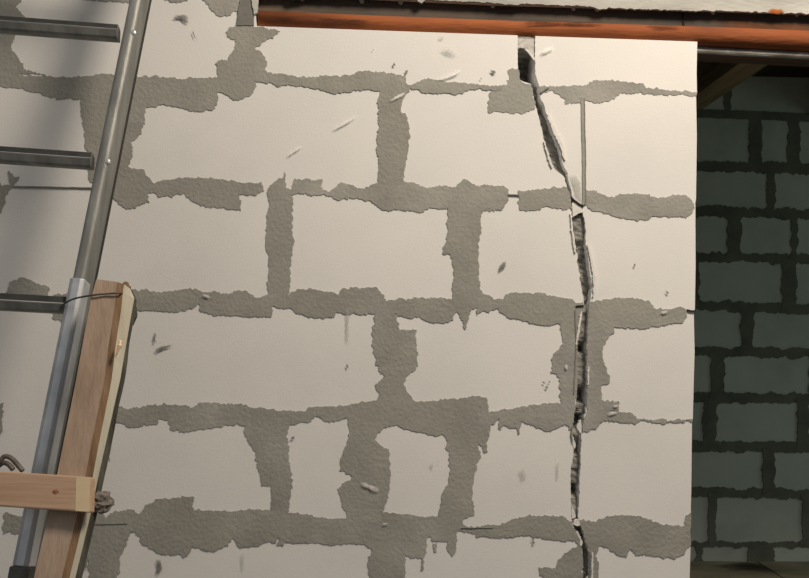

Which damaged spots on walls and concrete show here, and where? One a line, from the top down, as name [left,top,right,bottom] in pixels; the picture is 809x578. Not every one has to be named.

crack [517,36,596,578]